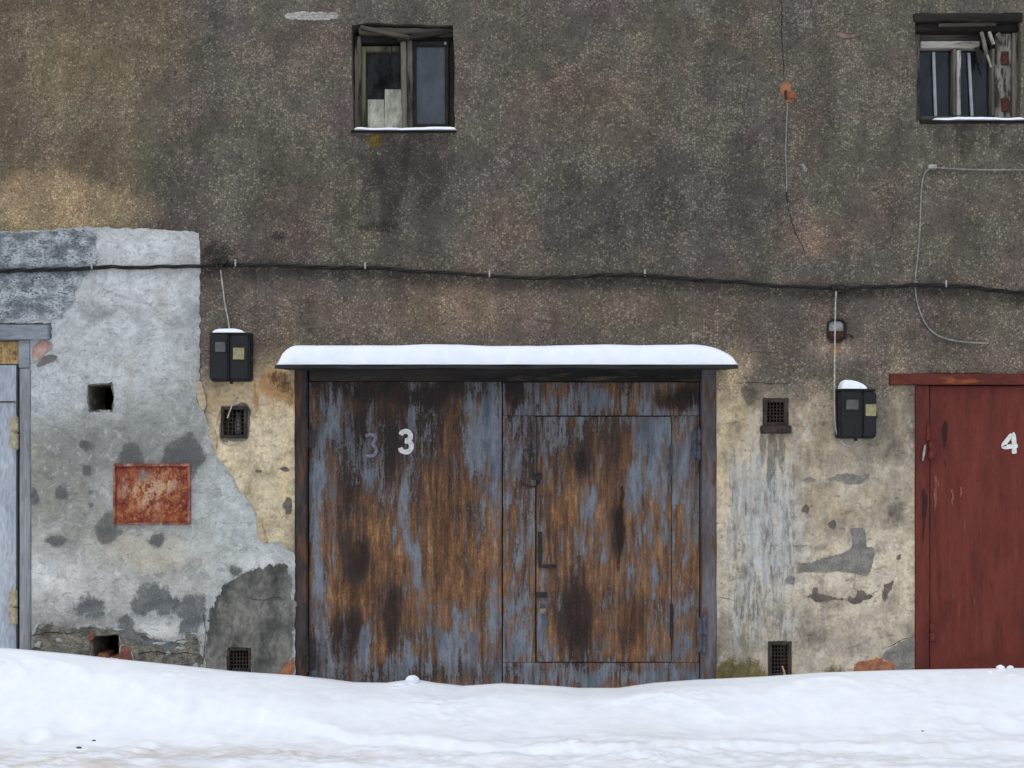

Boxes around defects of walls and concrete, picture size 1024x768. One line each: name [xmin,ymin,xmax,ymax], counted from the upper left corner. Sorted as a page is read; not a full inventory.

crack [778,0,786,75]
spalling [779,81,797,103]
crack [783,177,806,258]
spalling [206,402,280,544]
peeling [802,473,870,485]
peeling [283,497,292,516]
peeling [784,527,875,585]
peeling [806,579,895,604]
spalling [31,621,204,667]
flaking render [279,657,295,675]
peeling [853,638,915,671]